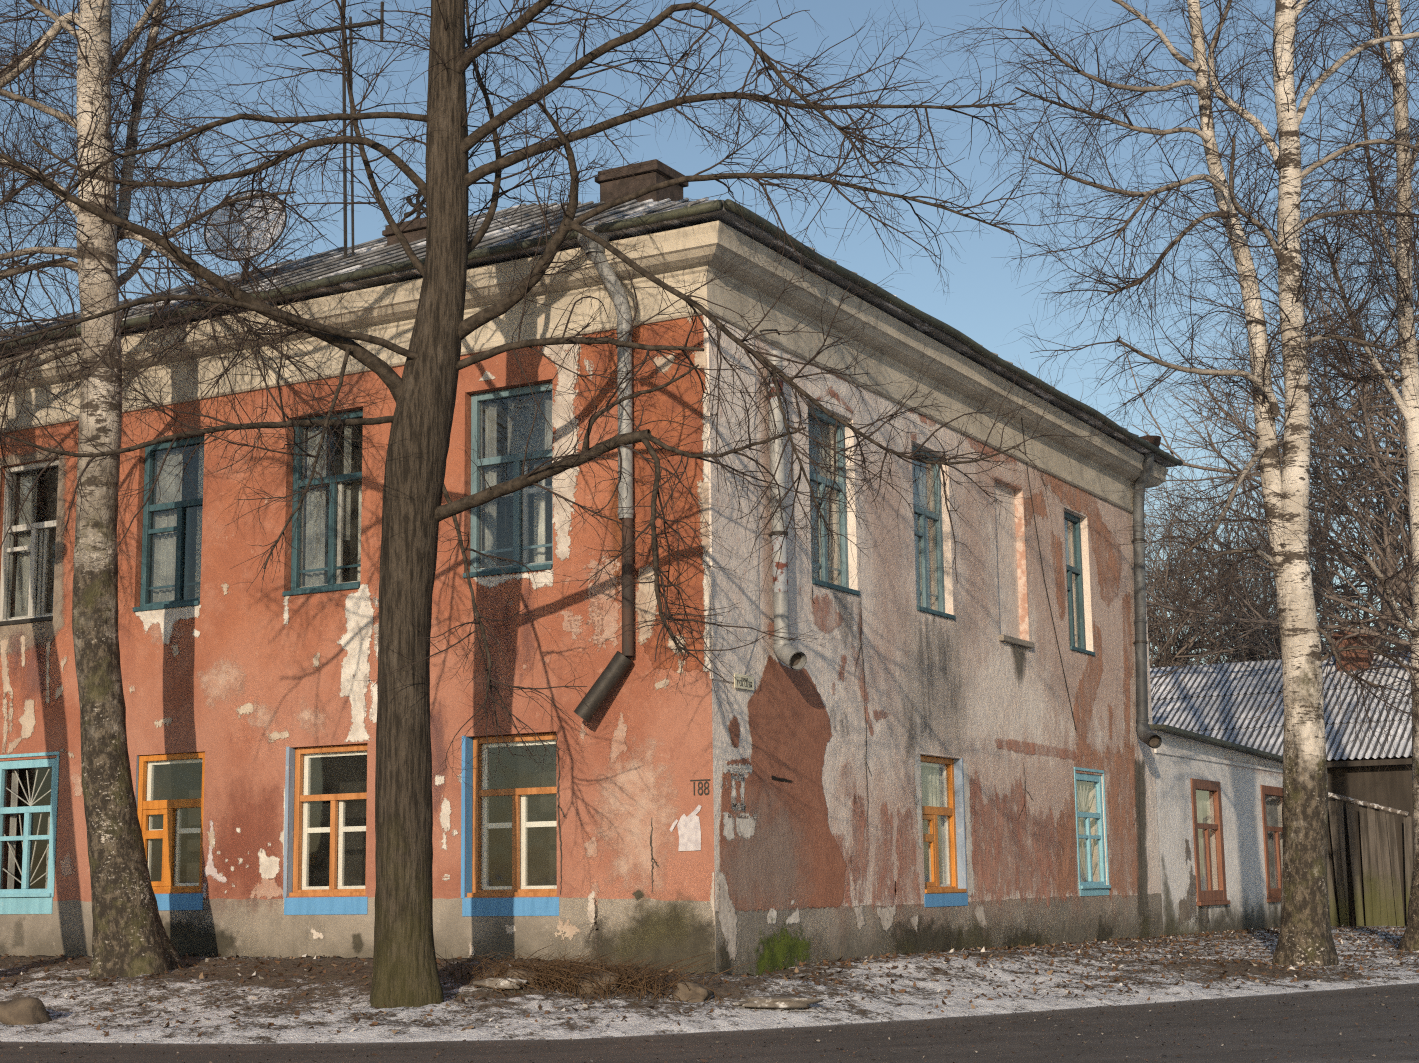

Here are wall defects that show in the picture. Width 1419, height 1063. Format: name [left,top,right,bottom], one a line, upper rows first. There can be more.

spalling [473,315,711,689]
peeling [0,635,68,754]
peeling [135,605,201,657]
peeling [283,596,291,624]
peeling [337,584,379,742]
peeling [833,655,891,736]
peeling [963,471,1140,930]
peeling [720,716,757,841]
spalling [202,789,288,903]
peeling [833,752,923,932]
water stain [588,907,715,974]
peeling [767,900,801,925]